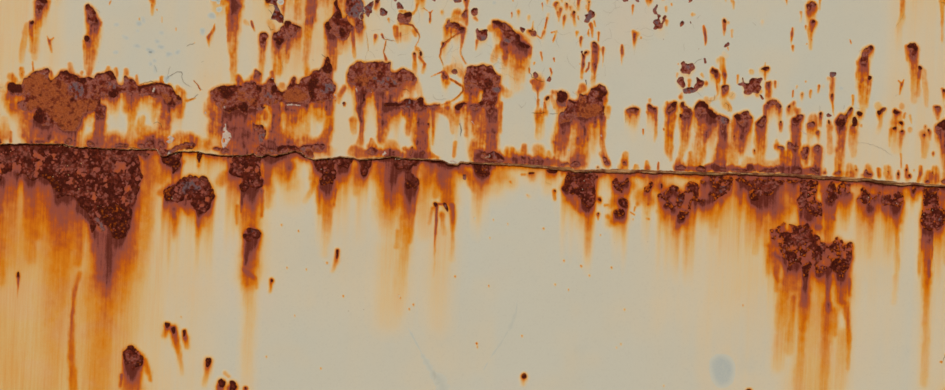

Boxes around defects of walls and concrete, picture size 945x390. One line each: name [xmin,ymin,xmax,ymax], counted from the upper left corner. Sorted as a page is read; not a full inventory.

rust [0,0,348,390]
rust [209,0,613,170]
rust [619,28,642,66]
rust [623,103,643,143]
rust [616,149,653,170]
rust [721,0,735,38]
rust [642,43,915,182]
rust [790,0,822,55]
rust [894,0,931,110]
rust [916,87,945,185]
rust [302,157,945,390]